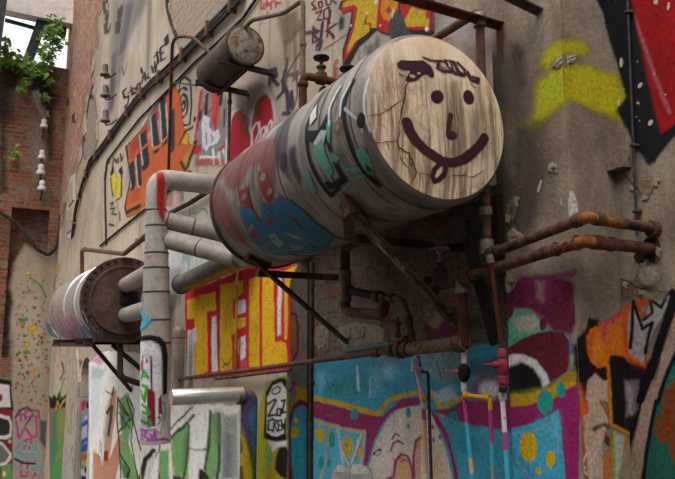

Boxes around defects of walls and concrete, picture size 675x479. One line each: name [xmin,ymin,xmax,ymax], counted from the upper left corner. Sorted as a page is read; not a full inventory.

peeling [314,324,329,351]
peeling [338,322,385,348]